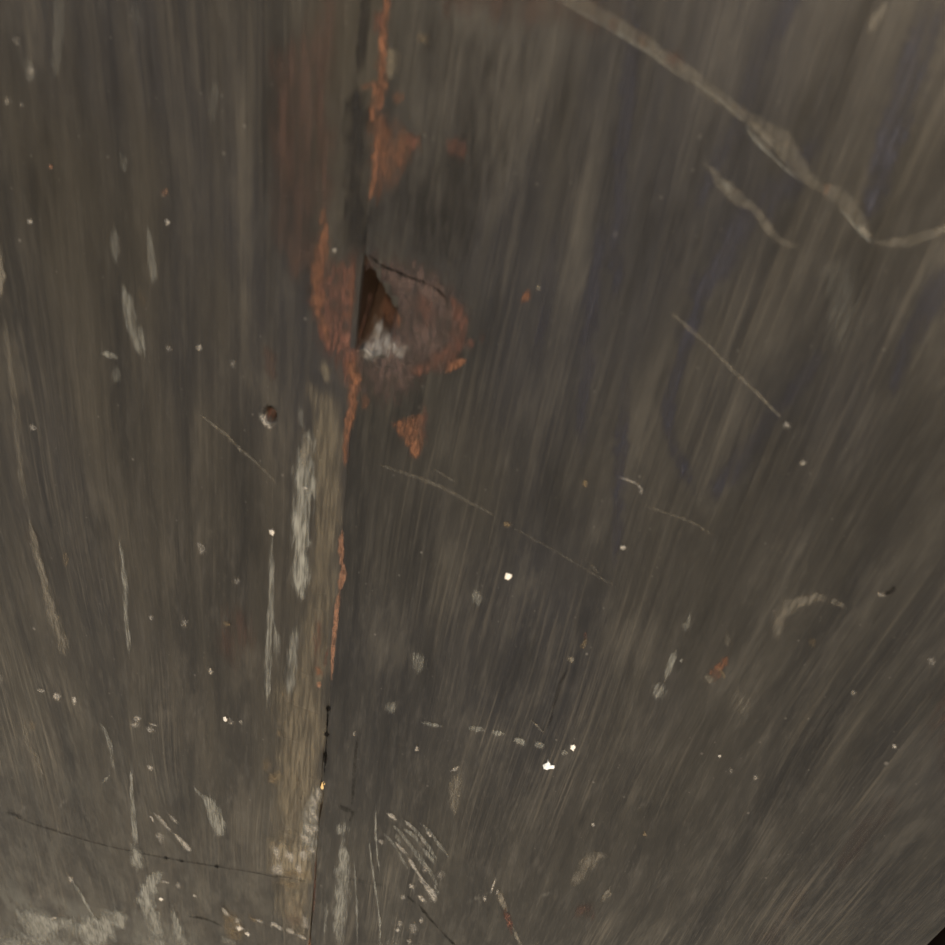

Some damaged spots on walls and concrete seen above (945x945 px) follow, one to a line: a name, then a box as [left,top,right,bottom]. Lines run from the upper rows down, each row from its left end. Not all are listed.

crack [322,707,330,772]